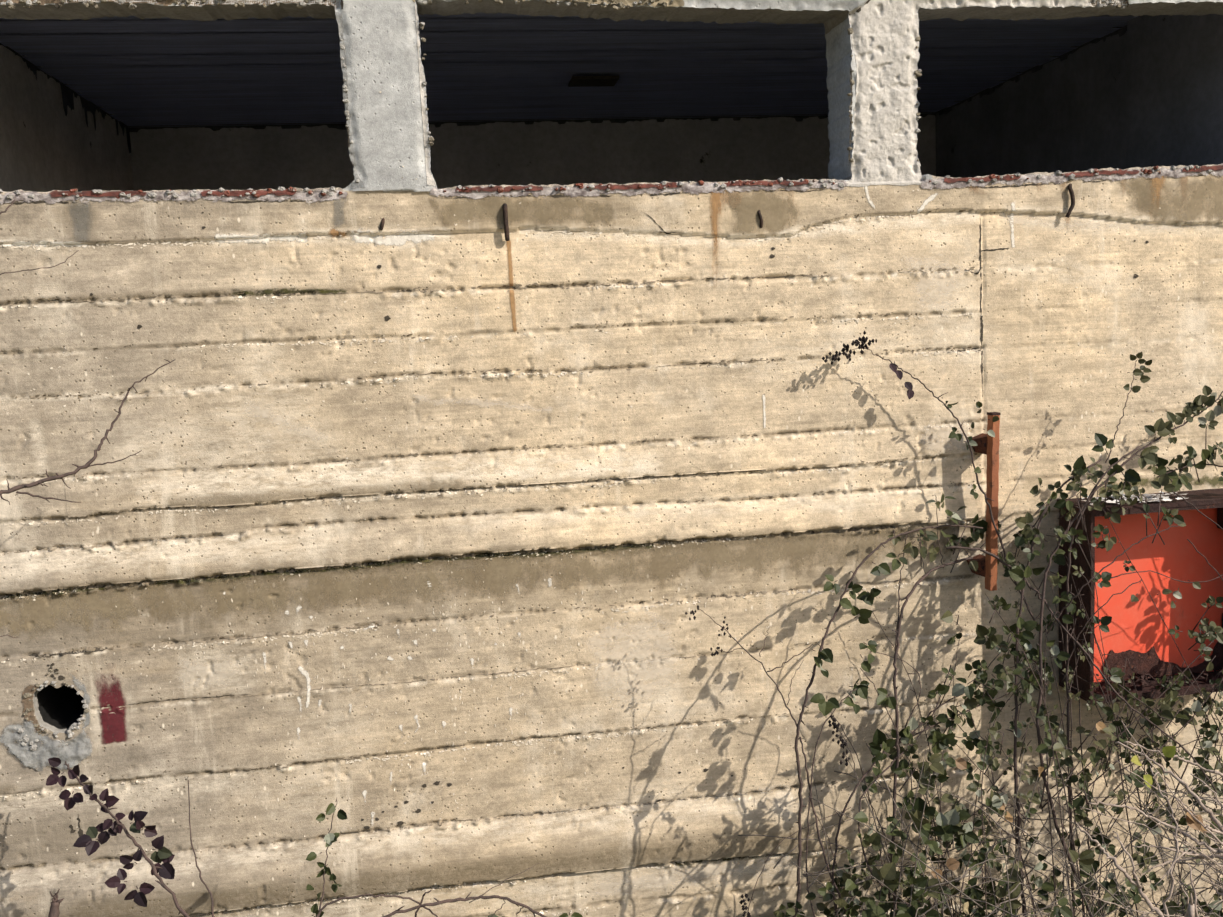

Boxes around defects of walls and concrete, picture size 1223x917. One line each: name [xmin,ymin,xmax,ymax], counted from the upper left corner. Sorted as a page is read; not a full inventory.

flaking render [656,0,1128,190]
water stain [335,195,611,246]
rust [710,180,807,251]
water stain [1125,178,1223,225]
rust [507,240,517,332]
spalling [2,649,139,751]